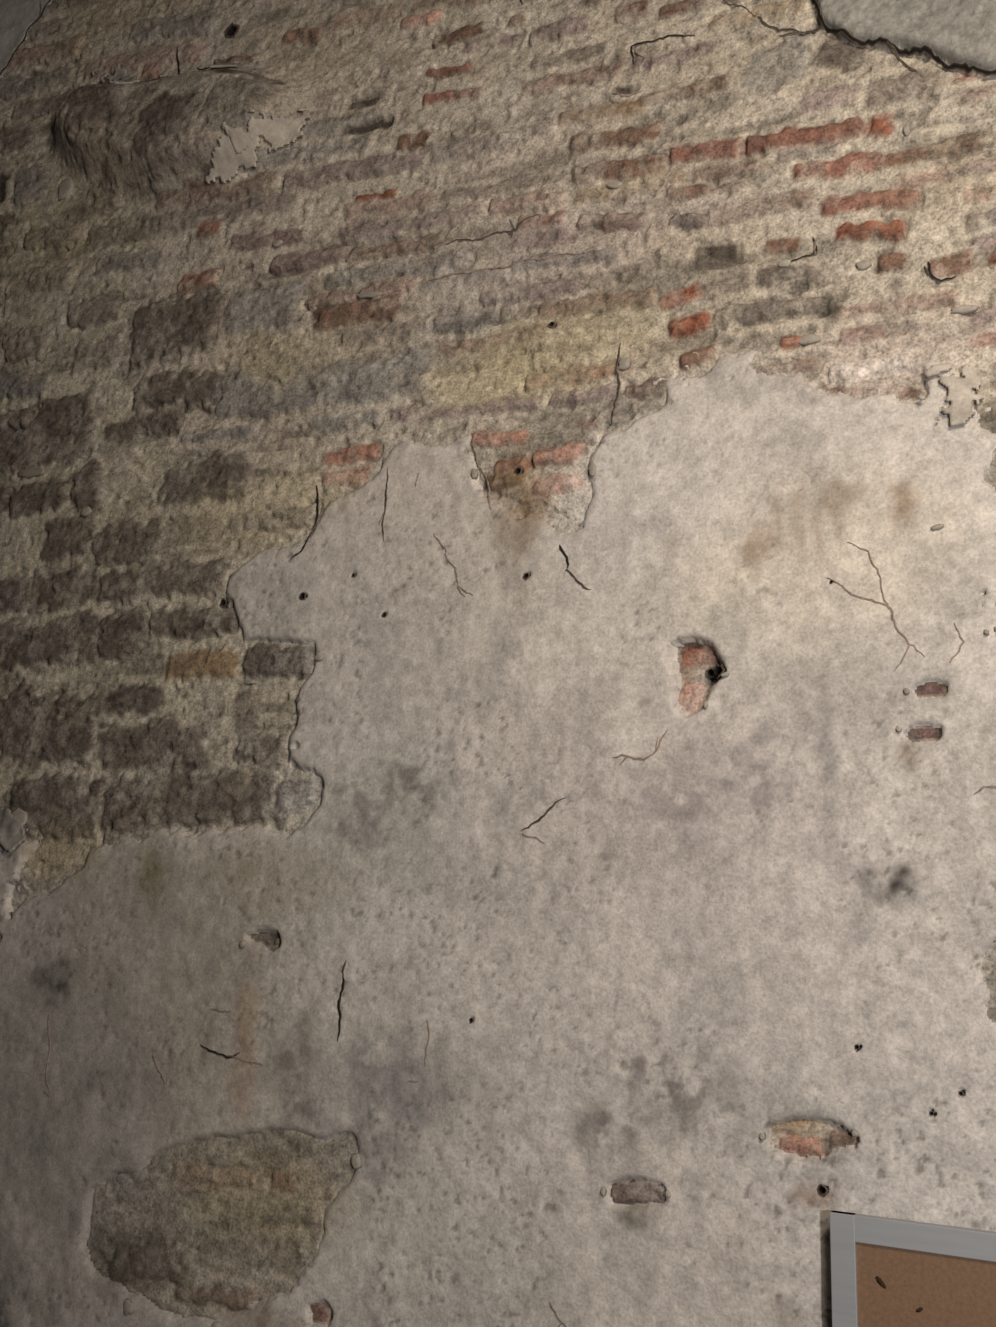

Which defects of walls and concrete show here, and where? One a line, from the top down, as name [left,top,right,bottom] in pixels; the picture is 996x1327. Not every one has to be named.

crack [723,0,996,76]
spalling [0,0,996,911]
crack [828,542,965,670]
spalling [239,932,281,952]
spalling [980,940,996,1023]
spalling [759,1118,860,1159]
spalling [87,1129,362,1327]
spalling [600,1178,671,1205]